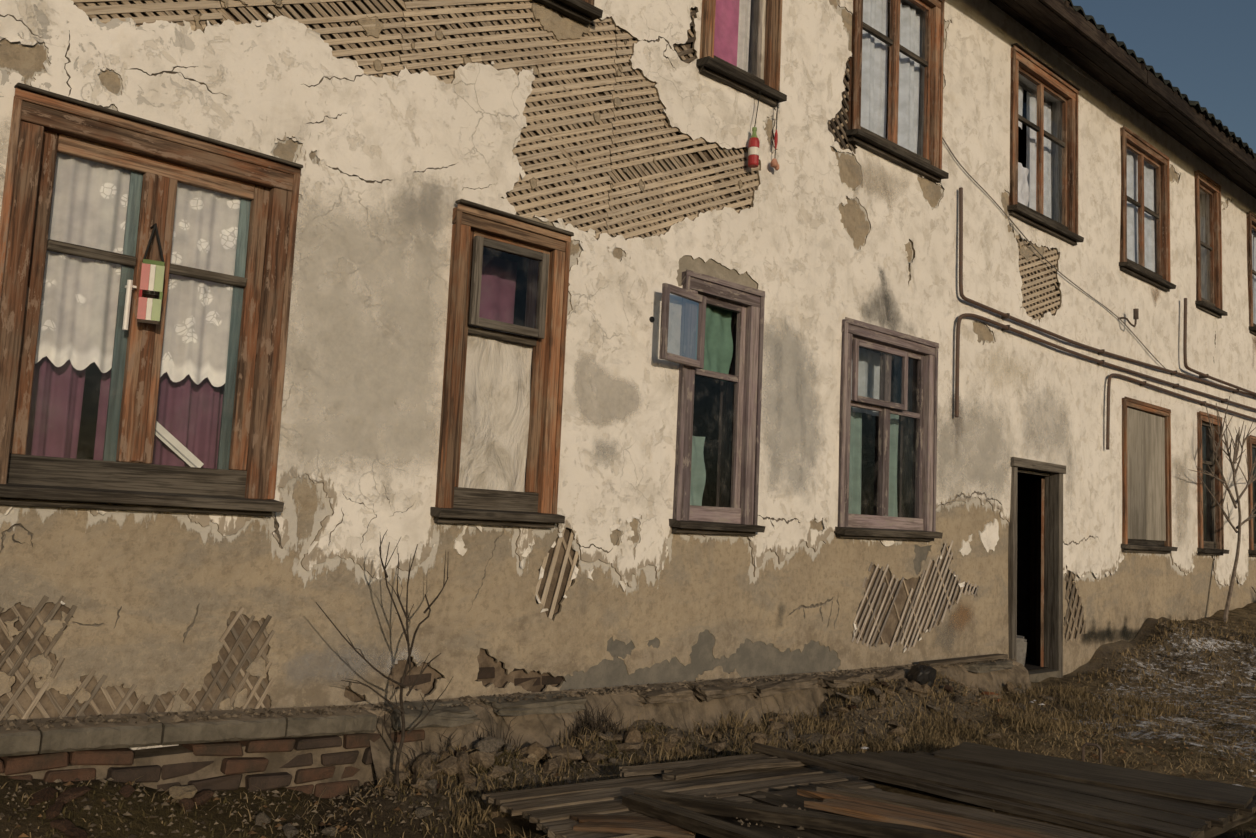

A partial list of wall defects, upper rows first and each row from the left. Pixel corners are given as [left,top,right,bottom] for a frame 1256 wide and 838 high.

crack [132,66,226,96]
crack [304,74,370,88]
crack [326,163,492,191]
spalling [68,0,779,315]
peeling [827,0,872,251]
spalling [1001,189,1062,322]
crack [274,512,283,549]
crack [328,484,415,550]
peeling [0,472,1009,721]
peeling [1063,552,1256,675]